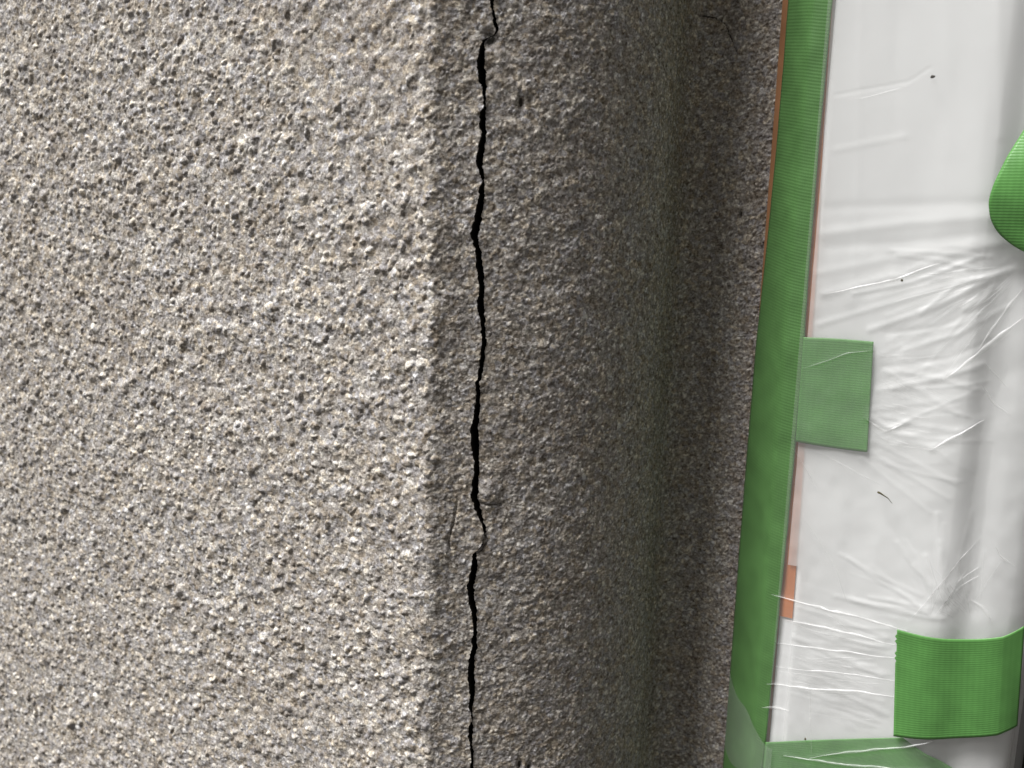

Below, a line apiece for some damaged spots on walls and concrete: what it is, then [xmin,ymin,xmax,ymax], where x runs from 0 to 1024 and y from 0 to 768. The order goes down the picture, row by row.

crack [449,0,499,768]